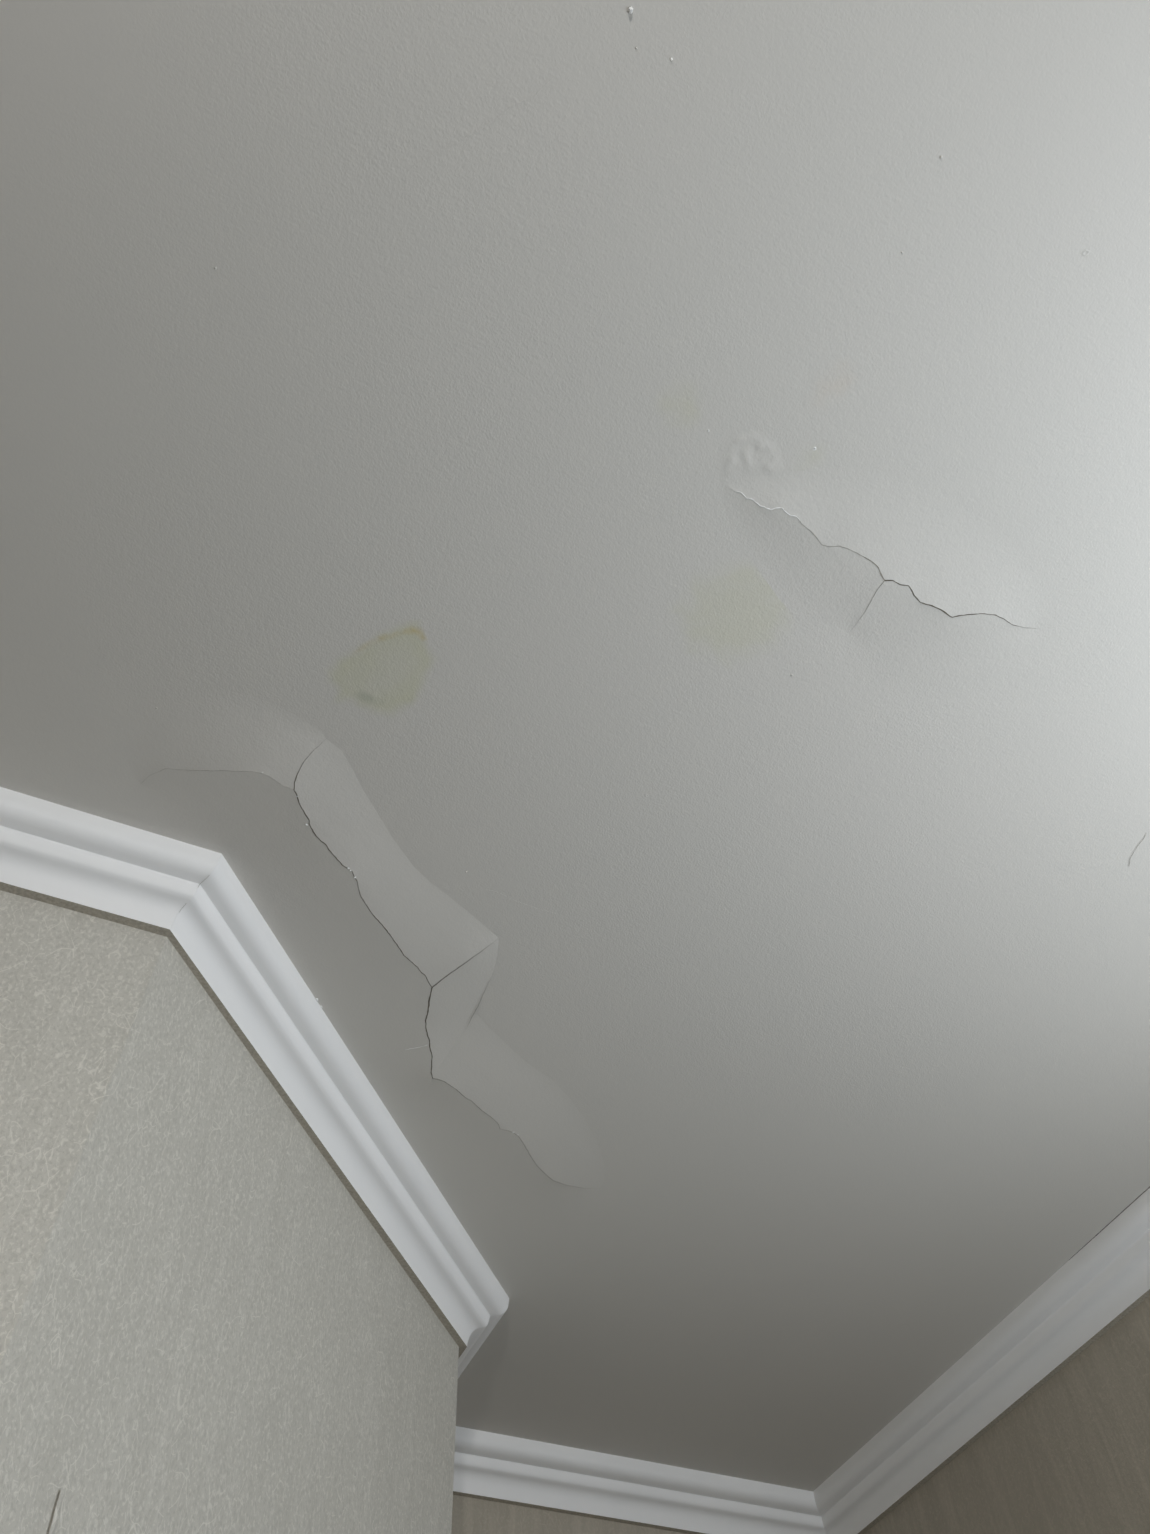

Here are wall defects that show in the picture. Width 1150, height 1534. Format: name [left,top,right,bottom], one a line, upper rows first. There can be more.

damp [323,618,443,720]
peeling [123,689,605,1279]